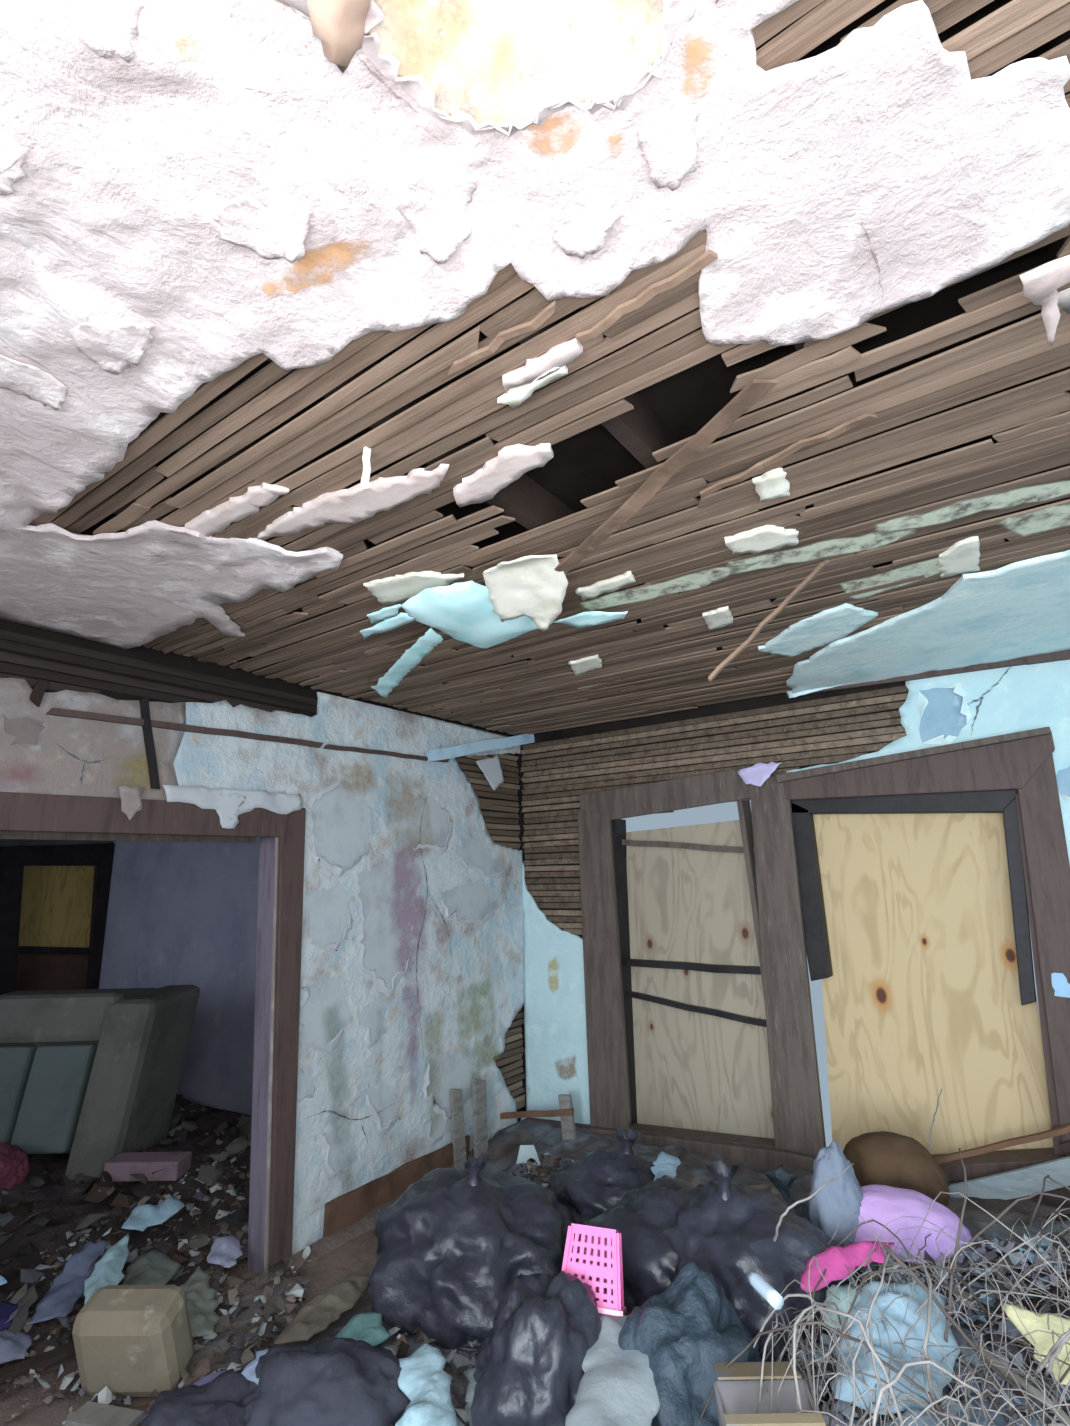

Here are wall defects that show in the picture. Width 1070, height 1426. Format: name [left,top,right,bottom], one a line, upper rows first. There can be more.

flaking render [70,0,145,62]
peeling [362,0,696,137]
flaking render [751,0,1070,108]
flaking render [0,133,29,196]
flaking render [638,107,701,191]
flaking render [213,194,313,264]
flaking render [397,167,477,264]
flaking render [549,186,619,259]
flaking render [0,224,1070,935]
peeling [422,1050,480,1147]
flaking render [493,1005,526,1110]